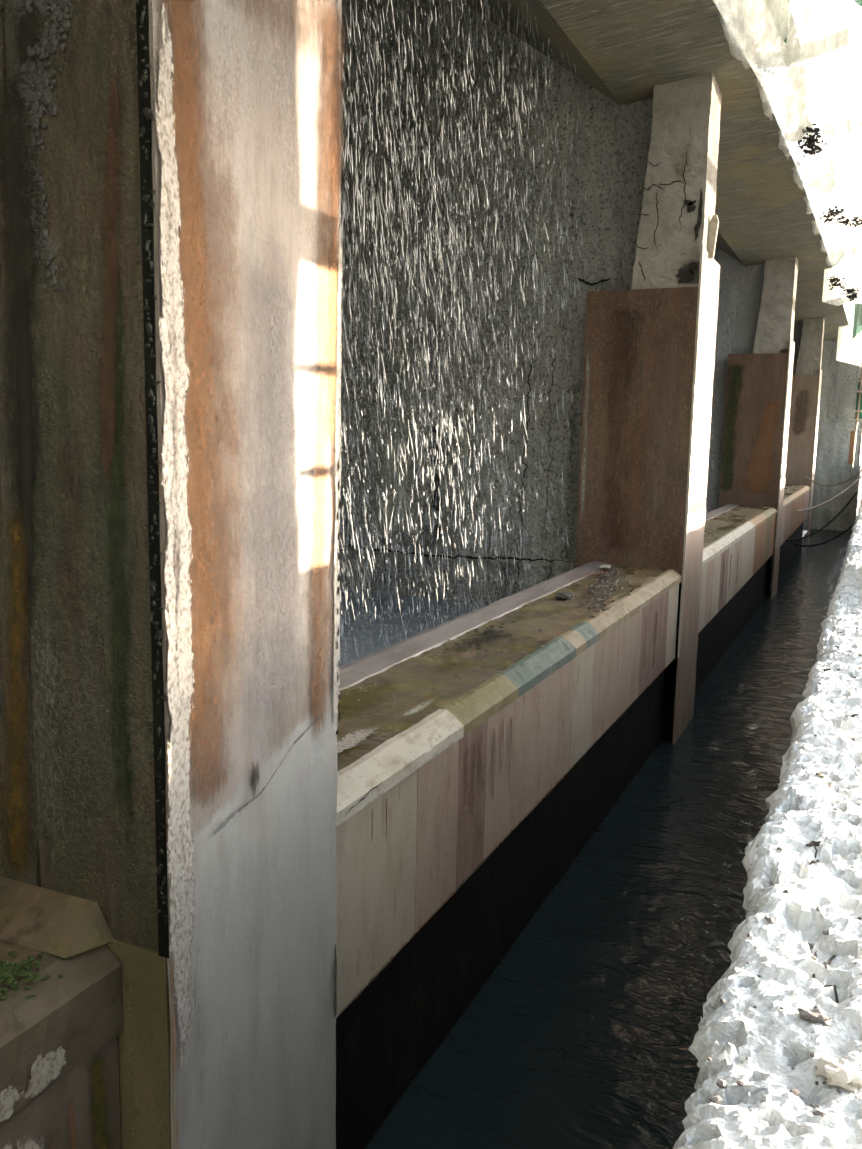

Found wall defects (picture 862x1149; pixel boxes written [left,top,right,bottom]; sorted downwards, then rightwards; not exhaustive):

spalling [4,0,74,300]
crack [633,147,687,280]
crack [574,278,610,286]
corrosion [162,0,239,804]
corrosion [246,0,343,731]
damp [0,81,132,868]
crack [812,951,854,1004]
peeling [3,1137,44,1149]
peeling [0,1046,66,1122]